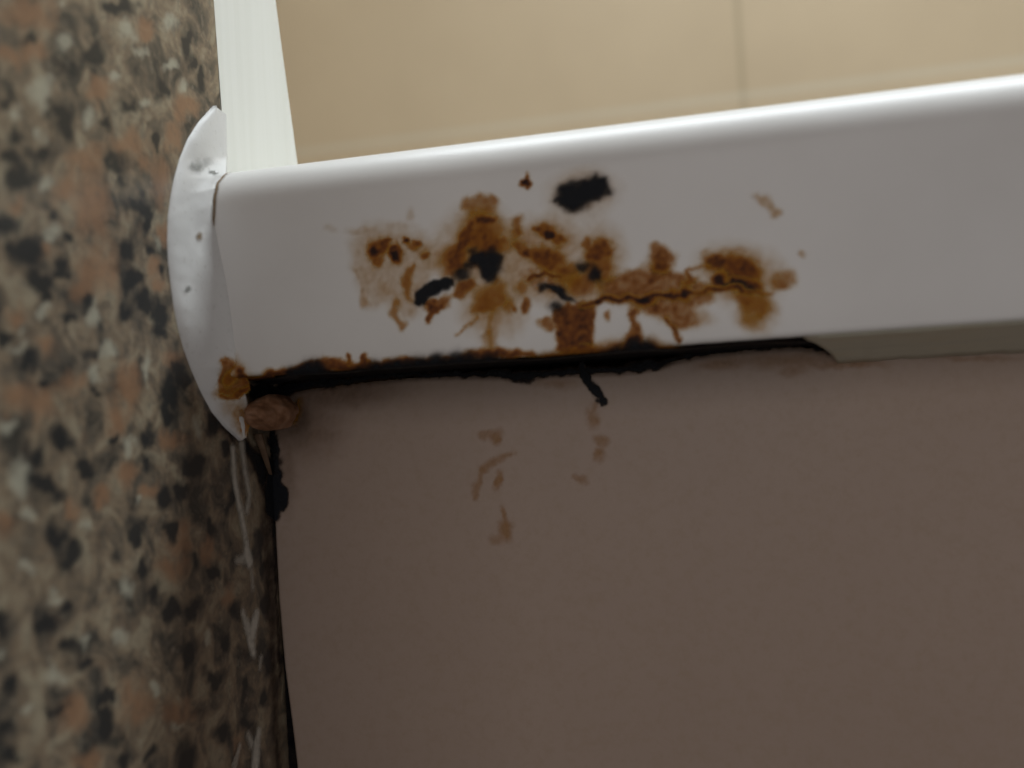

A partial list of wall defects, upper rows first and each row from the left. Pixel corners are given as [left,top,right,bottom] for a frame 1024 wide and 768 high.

rust [519,173,532,190]
peeling [553,173,612,212]
rust [366,194,625,358]
crack [249,242,830,407]
rust [703,249,795,324]
rust [218,353,413,434]